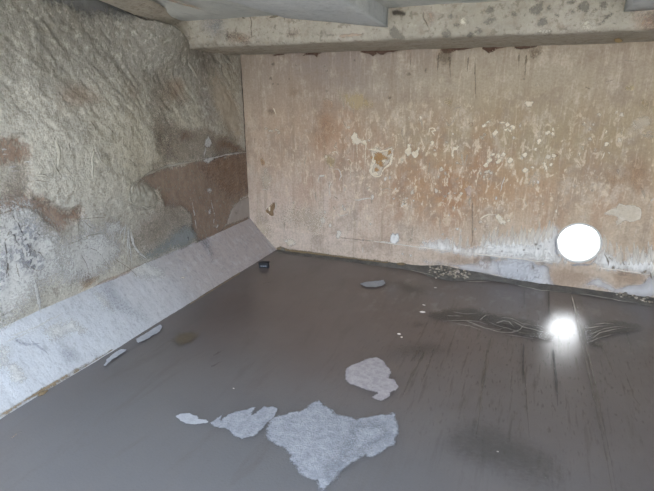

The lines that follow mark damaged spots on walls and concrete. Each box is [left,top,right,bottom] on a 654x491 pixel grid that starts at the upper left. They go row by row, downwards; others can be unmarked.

peeling [0,138,29,172]
peeling [347,126,394,177]
peeling [136,151,250,240]
peeling [605,203,642,225]
damp [425,229,565,285]
damp [595,251,654,296]